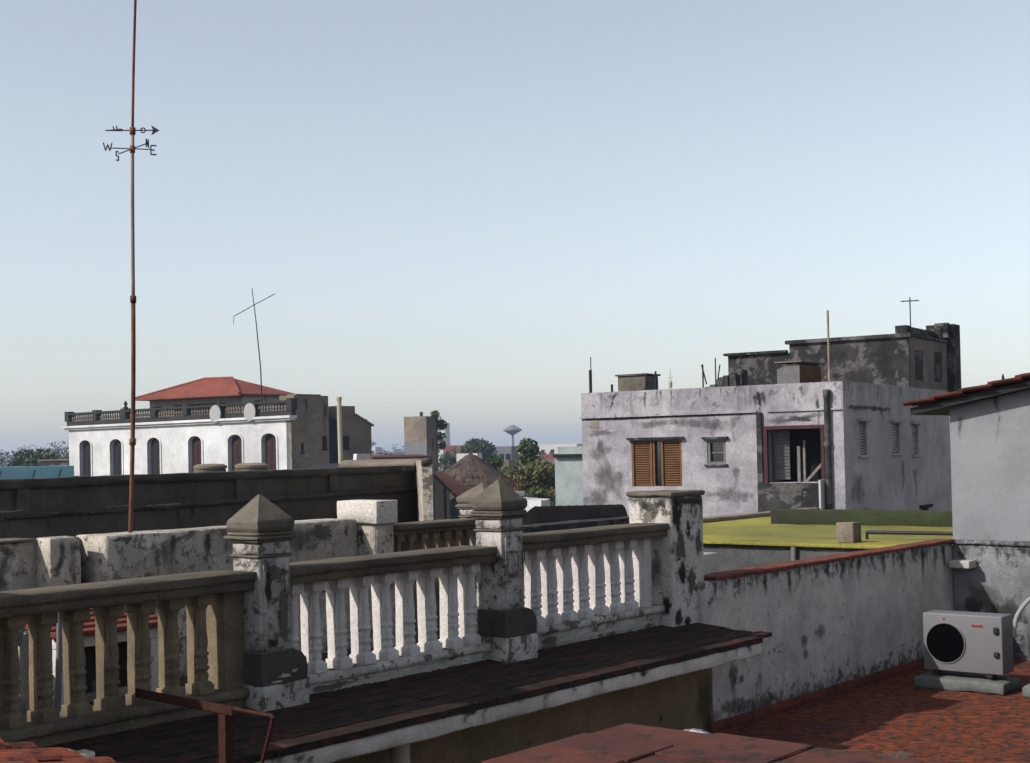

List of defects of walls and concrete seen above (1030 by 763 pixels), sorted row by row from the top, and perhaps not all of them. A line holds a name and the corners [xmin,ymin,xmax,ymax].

leakage [775,399,819,423]
leakage [640,498,701,519]
peeling [113,536,155,572]
peeling [651,555,661,577]
peeling [673,496,703,596]
leakage [826,546,945,579]
peeling [265,568,289,647]
leakage [966,585,1026,624]
leakage [700,666,774,733]